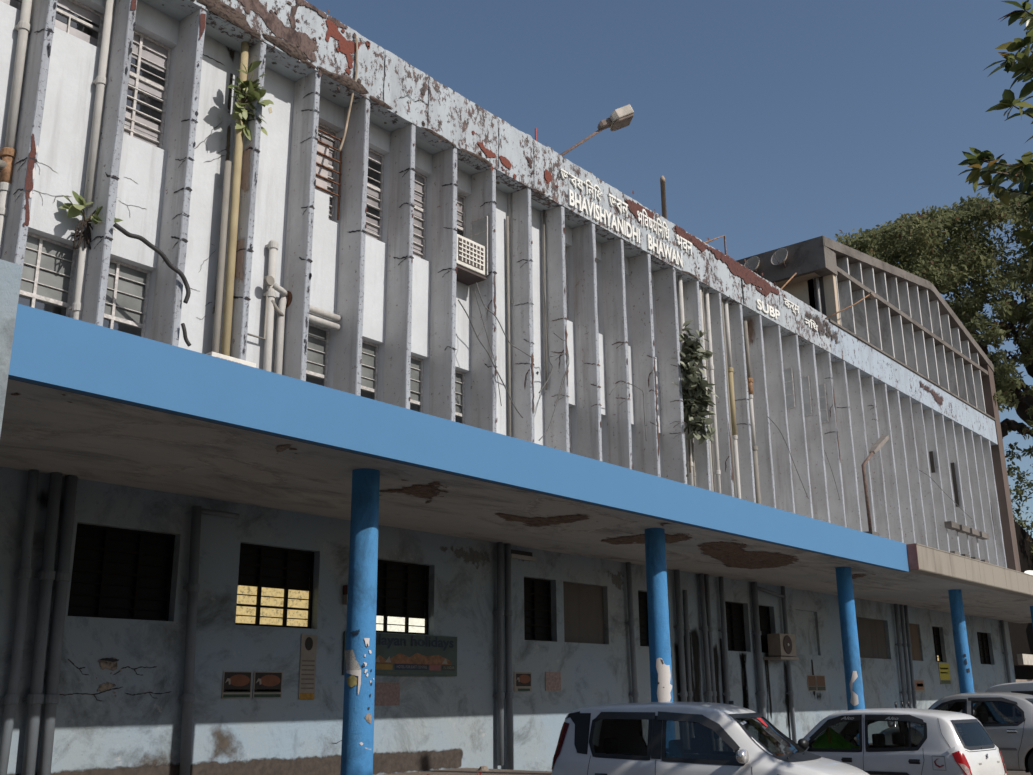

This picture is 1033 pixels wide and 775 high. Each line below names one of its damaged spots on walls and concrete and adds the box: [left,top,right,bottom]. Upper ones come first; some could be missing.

peeling [193,0,397,113]
peeling [421,121,559,197]
peeling [626,190,655,225]
peeling [673,225,785,297]
spalling [379,480,448,503]
spalling [494,513,598,529]
spalling [601,533,645,545]
spalling [660,522,799,569]
crack [59,659,172,701]
peeling [362,638,374,724]
peeling [656,654,672,702]
peeling [849,671,859,706]